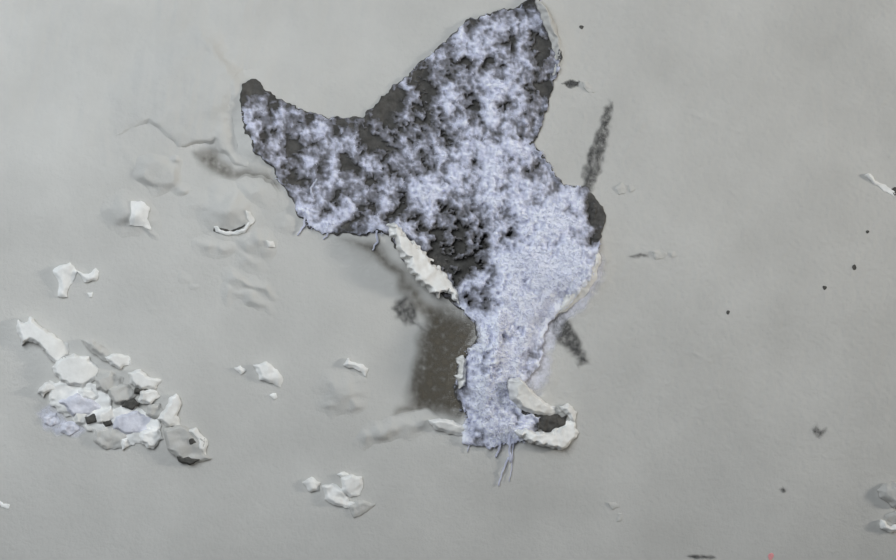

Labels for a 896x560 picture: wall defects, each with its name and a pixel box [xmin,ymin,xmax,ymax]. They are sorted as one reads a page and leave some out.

peeling [865,173,896,196]
peeling [234,0,606,436]
peeling [53,263,99,298]
peeling [16,317,211,465]
peeling [507,377,579,450]
peeling [302,472,375,518]
peeling [877,482,896,533]